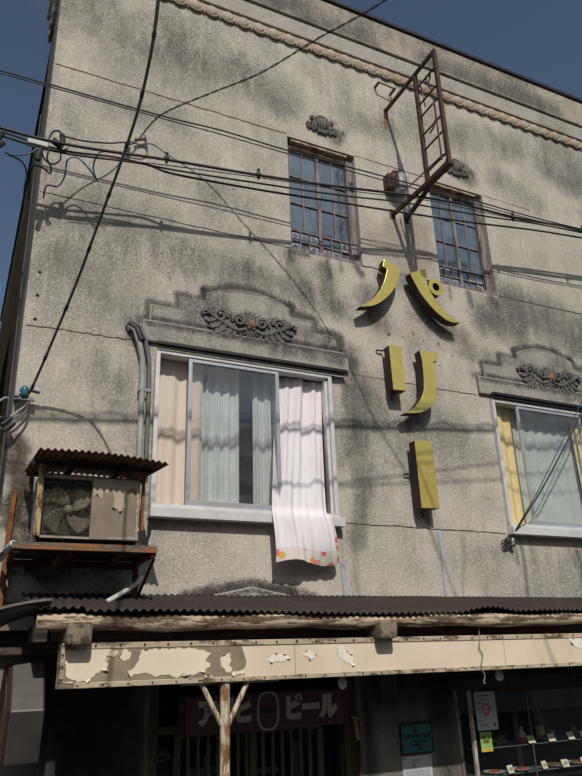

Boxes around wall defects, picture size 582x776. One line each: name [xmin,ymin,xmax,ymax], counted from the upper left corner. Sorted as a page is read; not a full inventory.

water stain [476,296,582,395]
water stain [2,434,32,542]
water stain [181,579,315,596]
peeling [63,646,246,683]
peeling [267,653,290,662]
peeling [337,645,355,665]
peeling [567,637,582,649]
water stain [27,654,145,776]